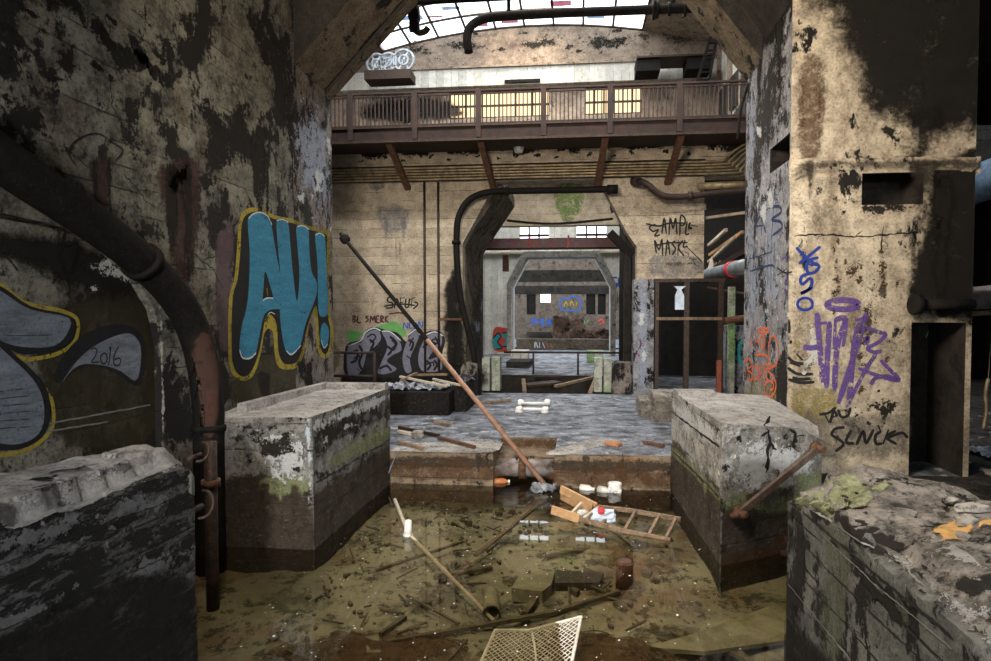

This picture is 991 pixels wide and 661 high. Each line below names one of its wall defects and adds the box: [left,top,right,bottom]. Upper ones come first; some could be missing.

rust [797,55,825,159]
rust [89,155,113,212]
crack [796,227,918,250]
crack [761,416,806,473]
spalling [0,452,195,554]
damp [225,433,502,573]
peeling [0,599,53,633]
damp [0,565,198,661]